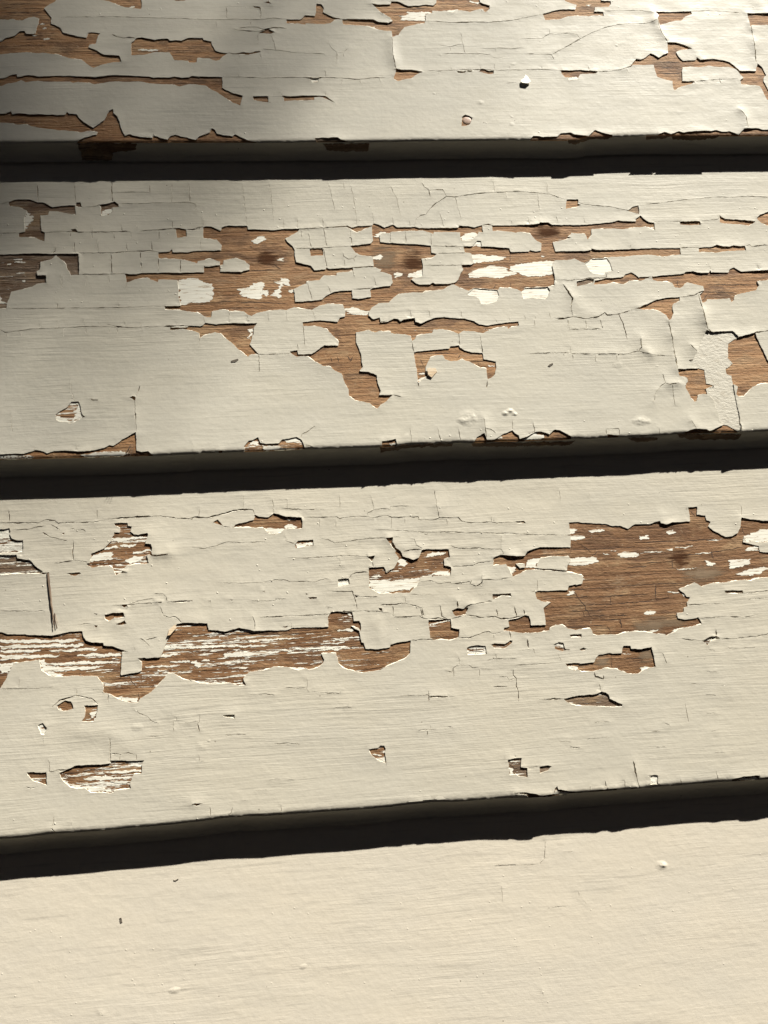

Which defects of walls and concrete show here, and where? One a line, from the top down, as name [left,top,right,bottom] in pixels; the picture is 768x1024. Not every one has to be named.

peeling [0,0,268,105]
peeling [287,0,490,37]
peeling [631,43,768,100]
crack [269,186,376,298]
crack [390,189,558,266]
peeling [125,206,768,408]
peeling [678,330,768,440]
crack [1,492,554,698]
peeling [368,537,451,593]
peeling [467,507,768,674]
peeling [0,612,411,703]
peeling [60,760,144,793]